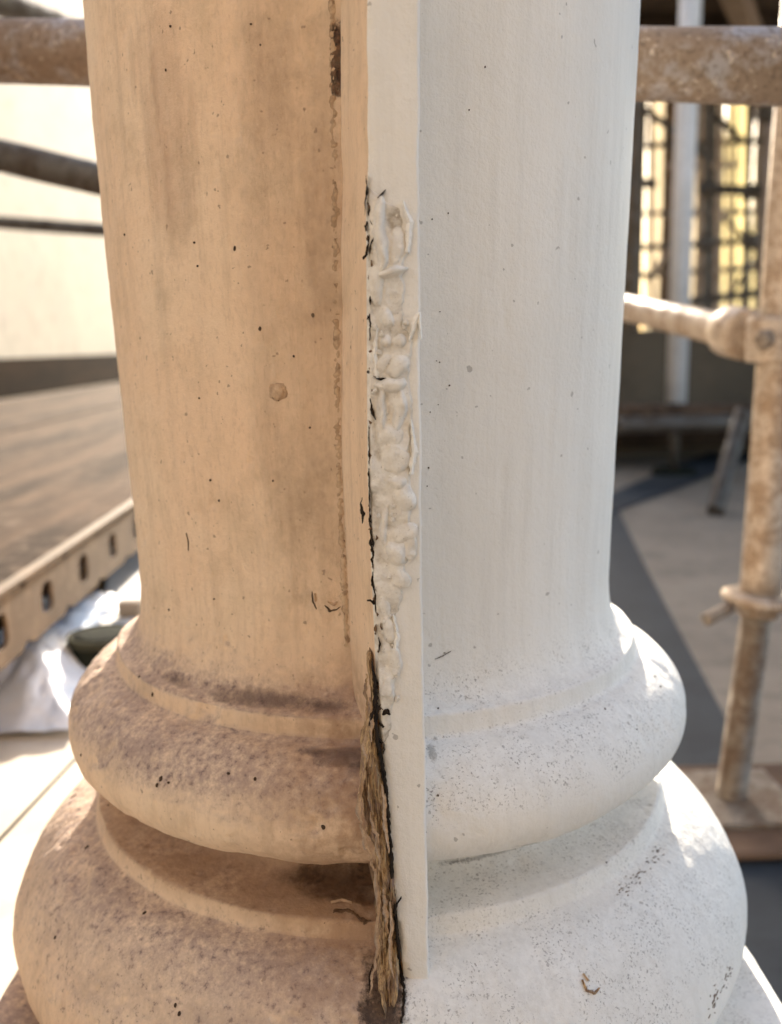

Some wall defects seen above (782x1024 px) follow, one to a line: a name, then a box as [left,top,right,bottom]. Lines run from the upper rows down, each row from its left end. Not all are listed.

corrosion [330,21,341,96]
spalling [331,187,422,1018]
crack [360,180,406,1023]